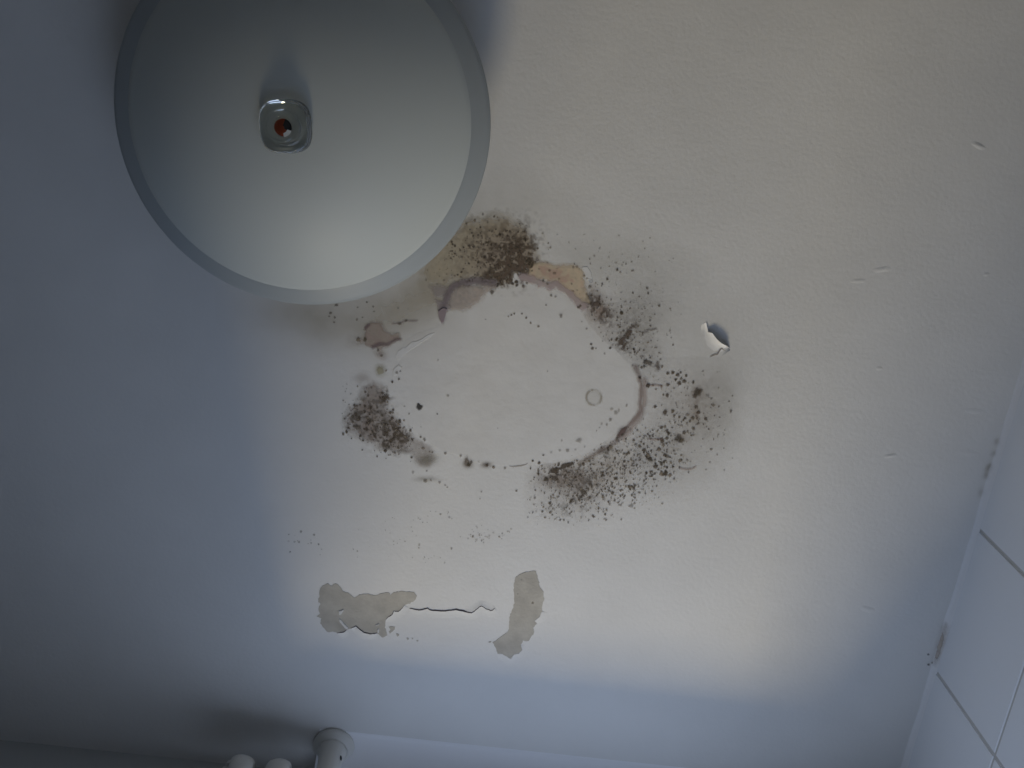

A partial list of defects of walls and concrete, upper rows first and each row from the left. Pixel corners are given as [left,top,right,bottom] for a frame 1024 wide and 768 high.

leakage [426,216,551,294]
peeling [699,323,730,358]
leakage [342,367,430,462]
leakage [530,266,718,523]
peeling [317,583,418,642]
crack [408,600,499,620]
peeling [489,571,547,665]